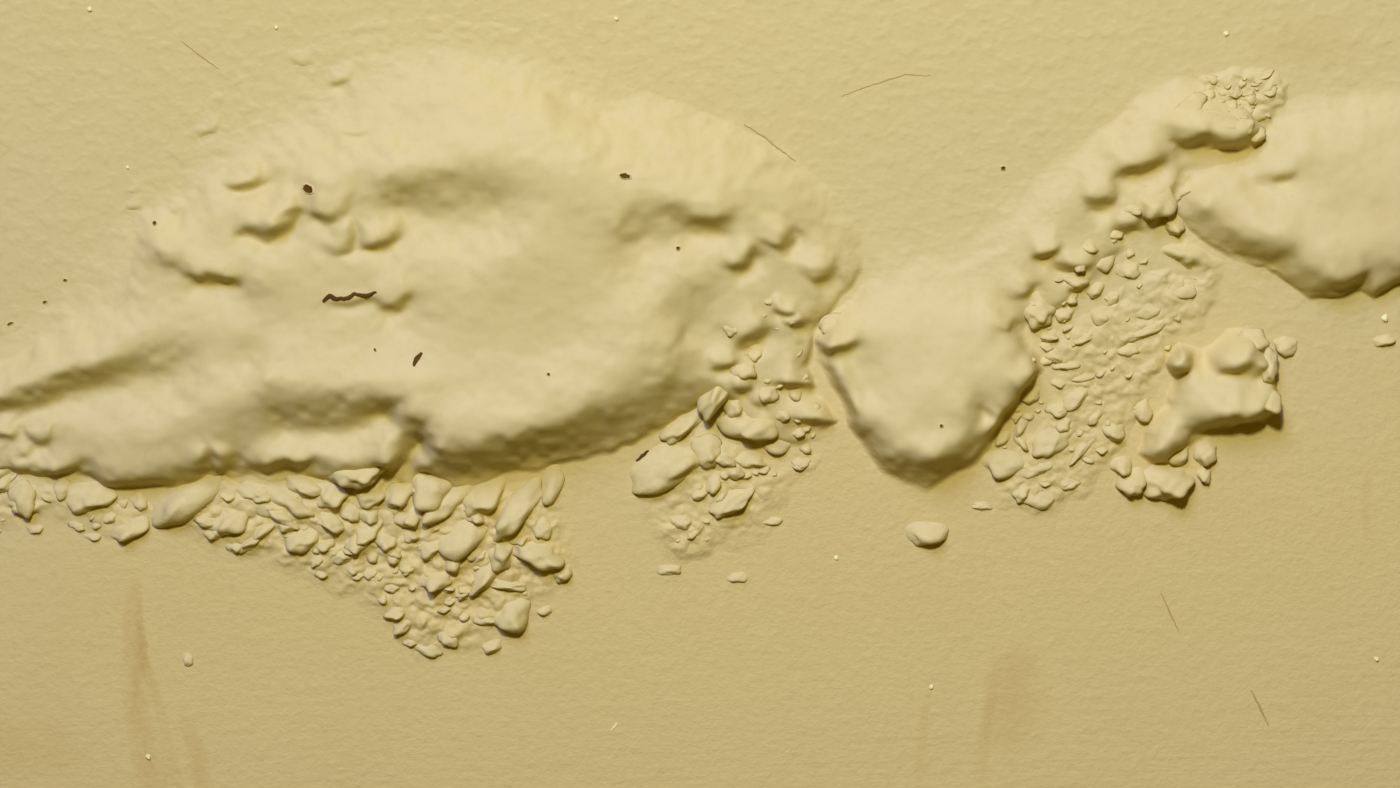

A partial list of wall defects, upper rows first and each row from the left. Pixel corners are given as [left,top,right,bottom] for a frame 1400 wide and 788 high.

peeling [971,212,1225,522]
peeling [1273,335,1298,358]
peeling [0,464,581,662]
peeling [630,408,823,575]